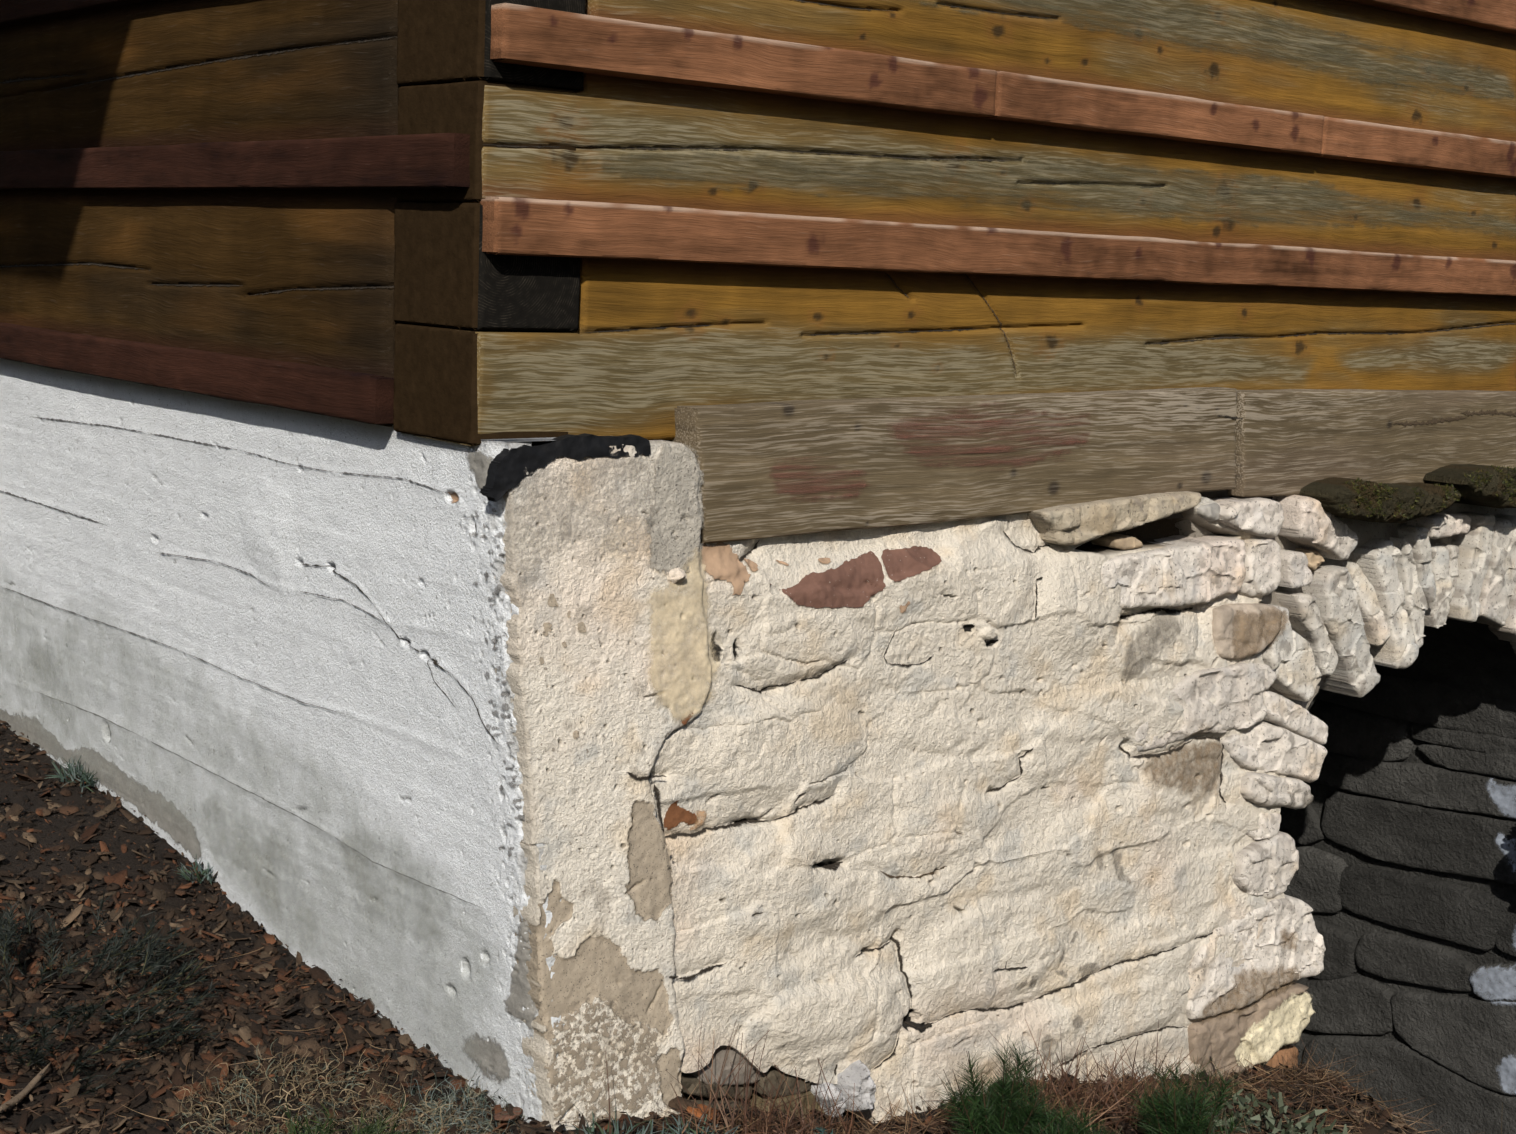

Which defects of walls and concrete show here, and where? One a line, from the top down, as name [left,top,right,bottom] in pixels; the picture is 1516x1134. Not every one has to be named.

crack [34,417,439,491]
crack [157,552,495,740]
peeling [542,594,586,647]
peeling [467,442,758,606]
spalling [770,546,942,608]
spalling [484,635,525,825]
peeling [627,800,674,921]
crack [626,772,833,839]
crack [813,861,843,870]
peeling [505,882,837,1128]
crack [669,963,726,981]
crack [834,932,1213,1075]